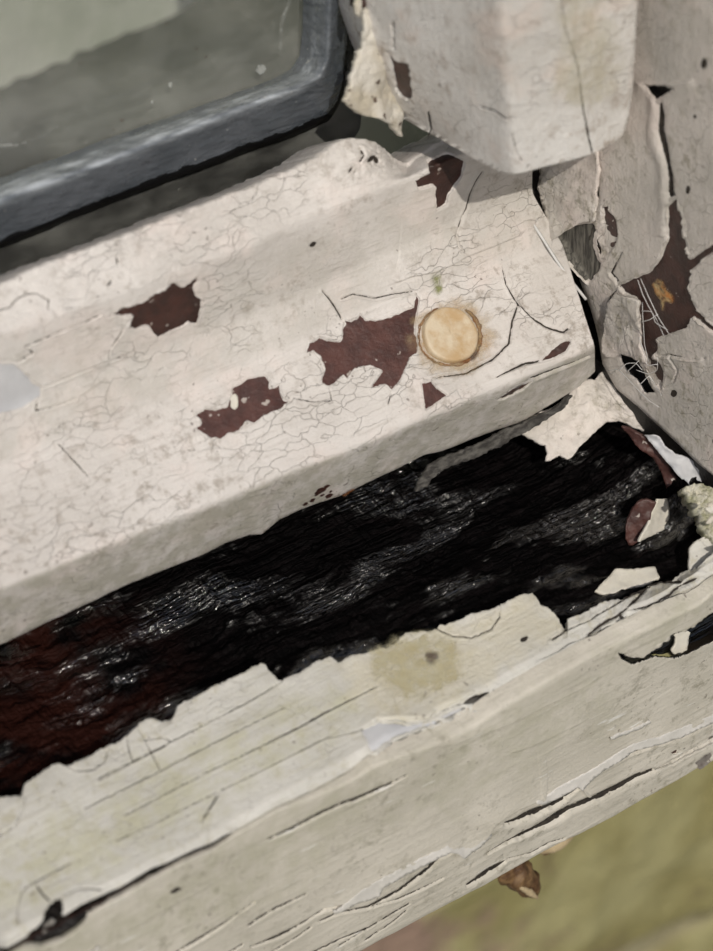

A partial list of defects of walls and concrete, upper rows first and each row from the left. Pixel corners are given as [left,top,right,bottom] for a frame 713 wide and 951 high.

crack [349,150,378,173]
peeling [108,277,204,340]
peeling [305,292,422,394]
corrosion [417,308,487,368]
crack [436,269,584,379]
peeling [601,186,713,388]
peeling [195,374,292,441]
peeling [512,372,702,484]
peeling [625,498,670,545]
crack [0,686,378,951]
crack [466,750,652,885]
crack [178,858,439,951]